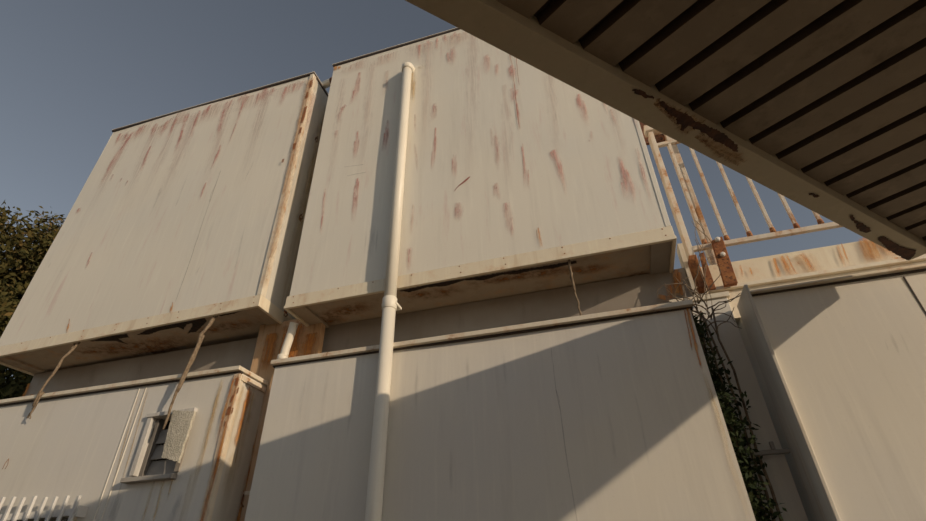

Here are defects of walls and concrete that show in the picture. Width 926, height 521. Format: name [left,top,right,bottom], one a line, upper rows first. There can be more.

peeling [632,89,738,152]
corrosion [270,79,312,257]
peeling [850,215,871,233]
peeling [878,236,916,260]
spalling [400,261,577,292]
spalling [92,318,207,344]
corrosion [262,323,317,364]
corrosion [201,376,251,521]